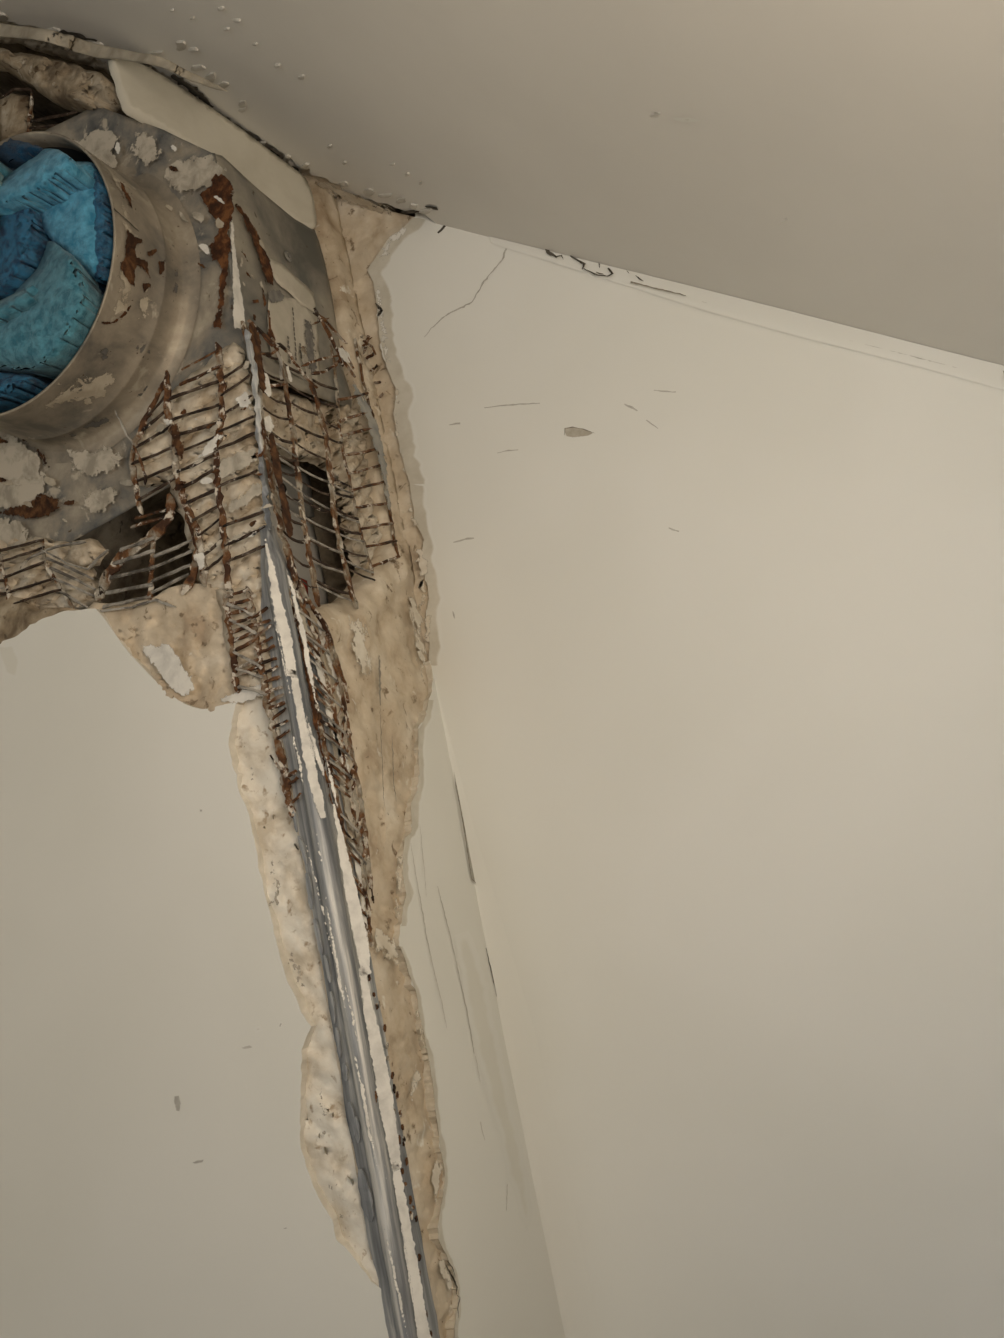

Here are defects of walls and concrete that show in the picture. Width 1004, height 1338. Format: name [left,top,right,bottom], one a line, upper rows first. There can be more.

spalling [0,12,111,75]
peeling [141,40,230,92]
rust [102,229,166,324]
rust [198,174,276,394]
rust [0,494,76,519]
rust [169,409,186,461]
rust [253,433,293,538]
rust [294,620,333,804]
spalling [217,100,463,1338]
spalling [0,584,379,1285]